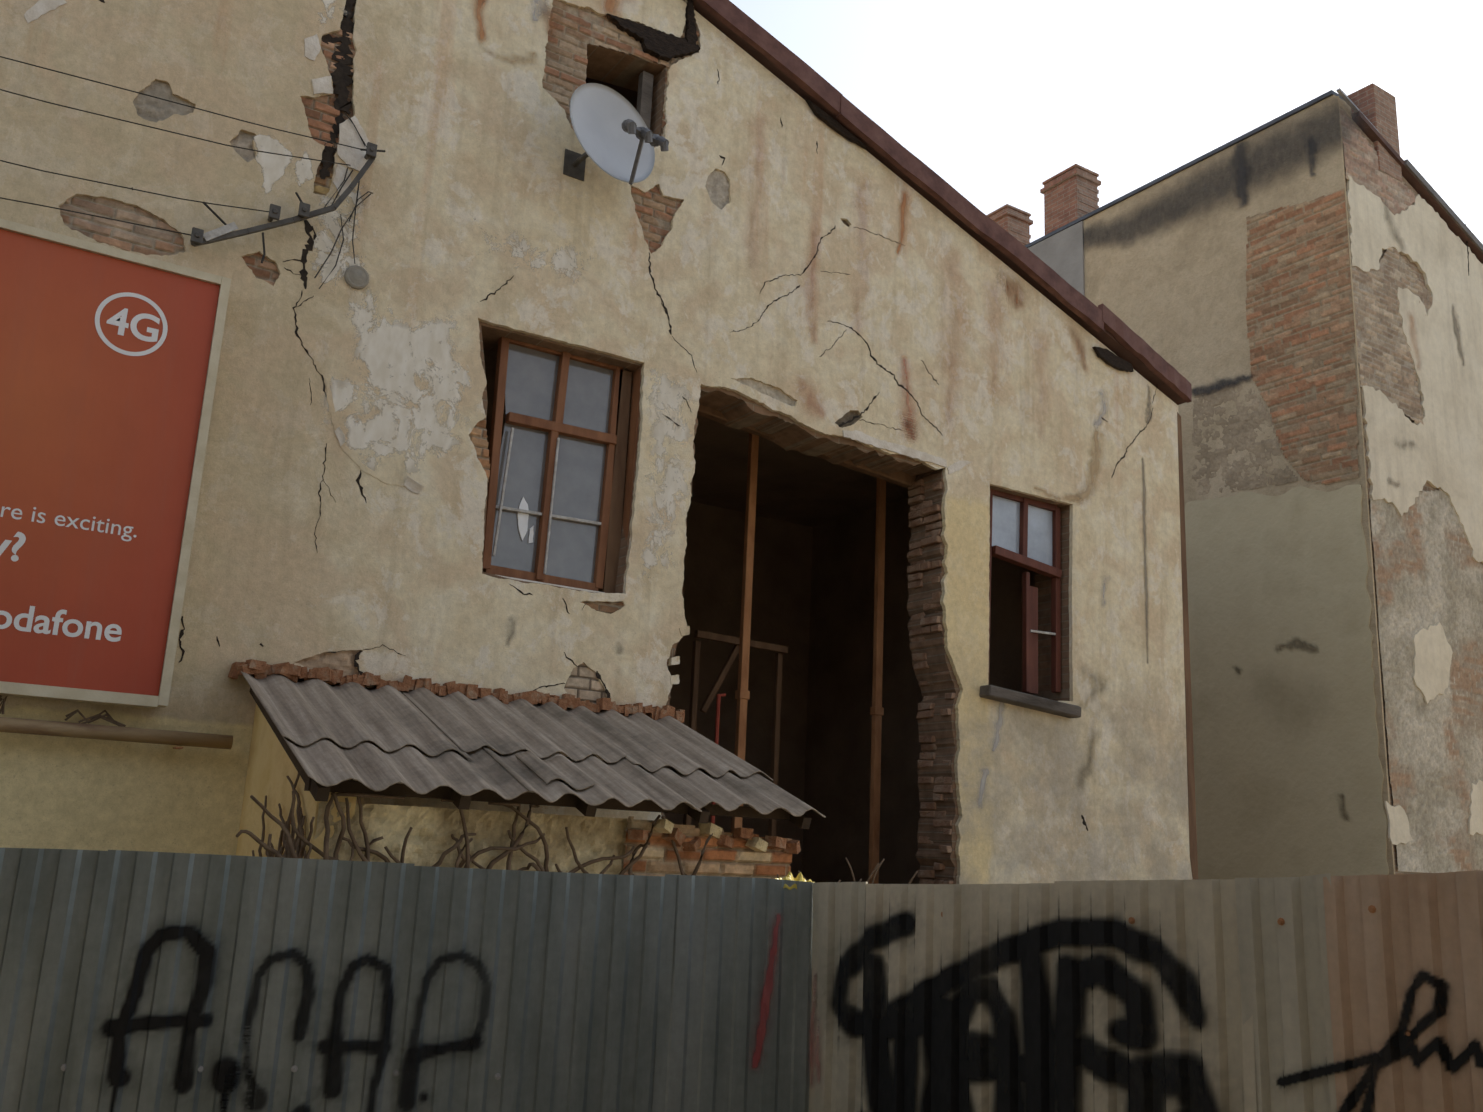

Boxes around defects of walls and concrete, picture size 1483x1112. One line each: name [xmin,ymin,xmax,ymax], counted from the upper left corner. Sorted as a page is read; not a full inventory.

rust [476,0,484,39]
spalling [133,80,195,122]
flaking render [542,0,700,148]
flaking render [59,187,185,256]
flaking render [631,185,682,254]
crack [283,220,326,405]
crack [648,253,697,426]
crack [732,227,902,332]
crack [819,321,942,435]
flaking render [1246,128,1433,485]
crack [314,443,366,549]
flaking render [564,663,607,704]